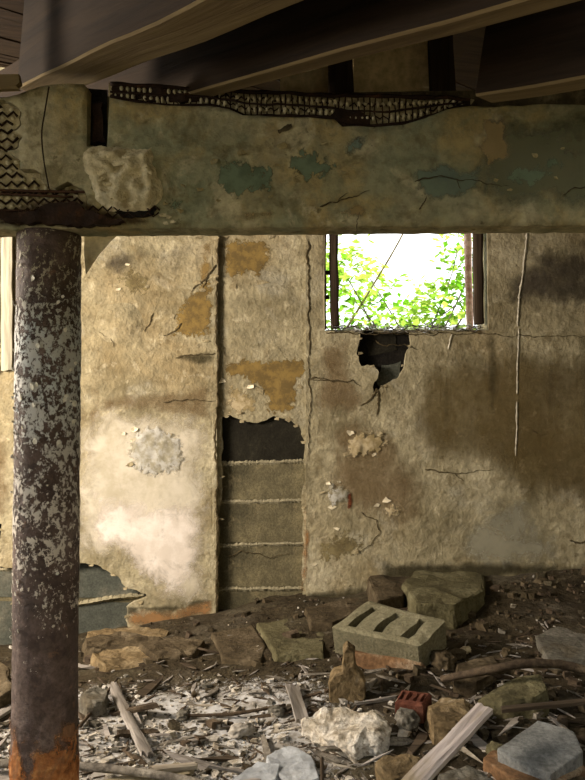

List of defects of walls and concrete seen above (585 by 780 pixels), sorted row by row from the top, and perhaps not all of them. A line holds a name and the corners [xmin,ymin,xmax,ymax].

spalling [88,81,480,199]
crack [415,175,507,210]
peeling [0,104,184,649]
peeling [168,235,275,342]
spalling [357,330,411,417]
crack [305,239,585,456]
leakage [425,233,585,493]
leakage [80,413,209,607]
spalling [218,355,364,610]
leakage [385,504,556,577]
corrosion [8,723,80,780]